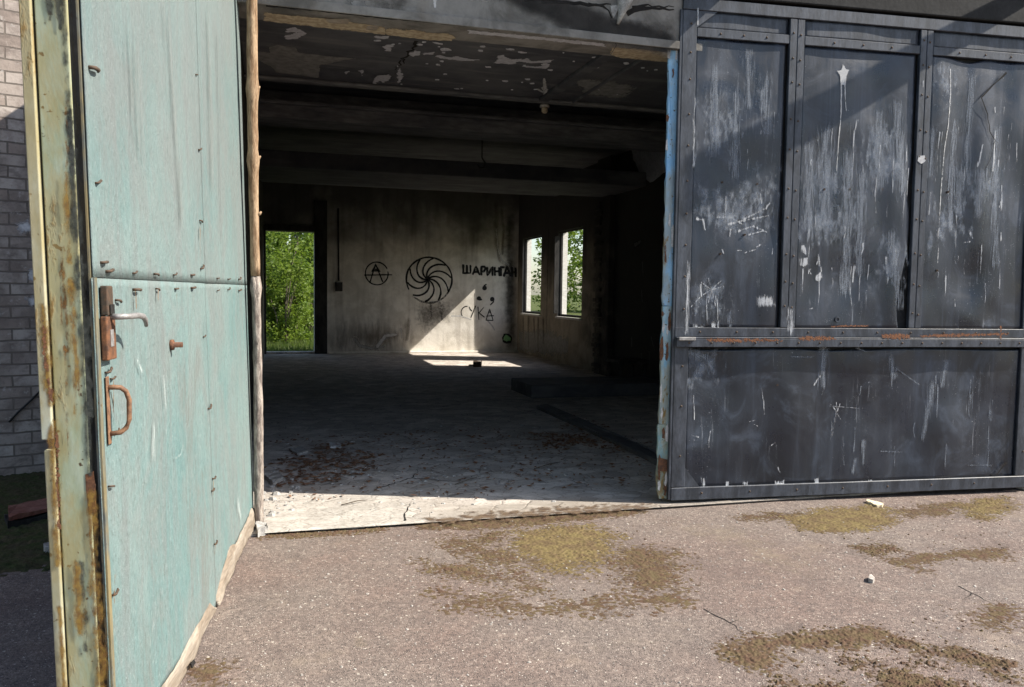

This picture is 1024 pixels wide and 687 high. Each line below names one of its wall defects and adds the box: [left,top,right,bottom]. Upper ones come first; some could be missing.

crack [266,5,492,70]
peeling [258,12,678,90]
crack [567,1,674,18]
rust [41,248,80,406]
rust [660,311,671,361]
rust [881,326,1009,340]
rust [48,420,115,687]